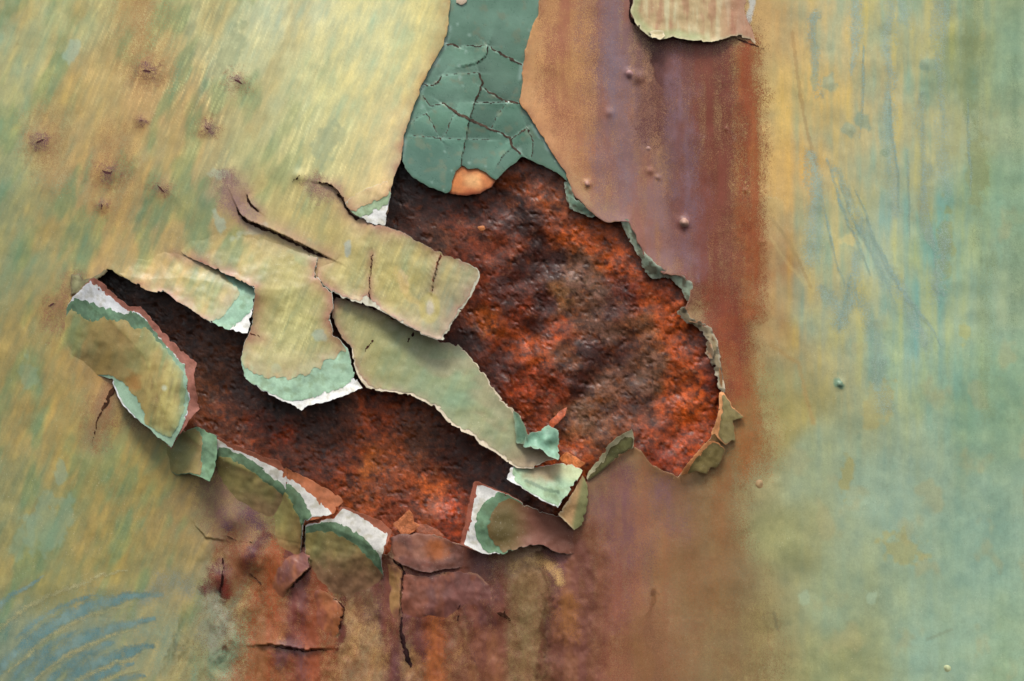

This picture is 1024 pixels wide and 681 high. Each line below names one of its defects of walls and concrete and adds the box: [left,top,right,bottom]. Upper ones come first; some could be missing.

peeling [631,0,756,44]
crack [413,43,534,165]
crack [236,194,327,258]
crack [292,175,359,221]
corrosion [11,0,786,681]
peeling [621,219,743,475]
crack [92,386,116,446]
peeling [64,181,634,637]
crack [393,559,412,668]